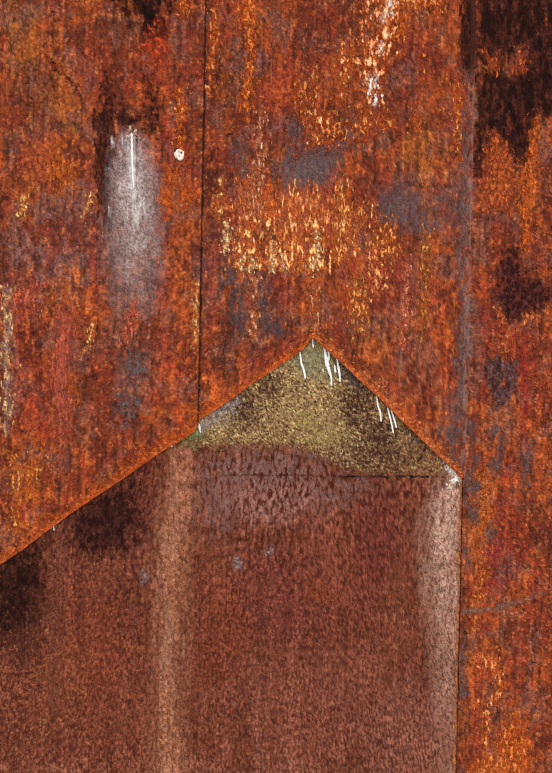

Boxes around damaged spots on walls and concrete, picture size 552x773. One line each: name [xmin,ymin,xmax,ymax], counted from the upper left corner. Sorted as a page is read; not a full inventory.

rust [45,128,79,203]
water stain [92,72,165,266]
water stain [111,0,176,43]
rust [141,19,191,150]
rust [157,163,197,219]
rust [204,0,447,350]
rust [418,69,469,160]
rust [481,46,528,77]
water stain [459,0,552,177]
rust [478,109,546,254]
water stain [491,247,551,325]
rust [0,274,538,773]